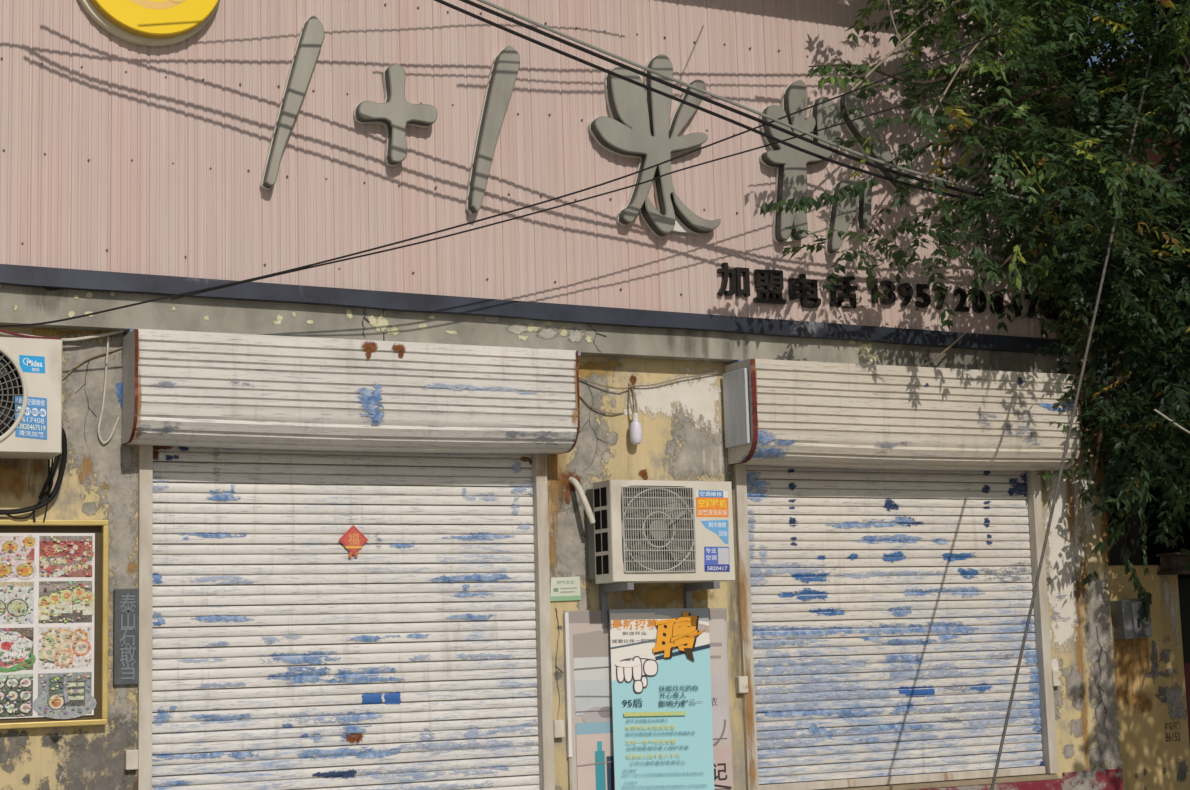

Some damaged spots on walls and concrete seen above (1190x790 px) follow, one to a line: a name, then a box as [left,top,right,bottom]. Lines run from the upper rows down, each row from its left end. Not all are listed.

corrosion [362,342,378,360]
corrosion [392,344,405,358]
peeling [41,332,138,790]
peeling [175,532,248,540]
peeling [208,450,241,501]
peeling [430,573,517,598]
peeling [442,460,533,541]
peeling [503,362,1123,790]
peeling [153,705,250,726]
peeling [253,635,538,790]
crack [1094,627,1108,739]
water stain [1125,579,1178,712]